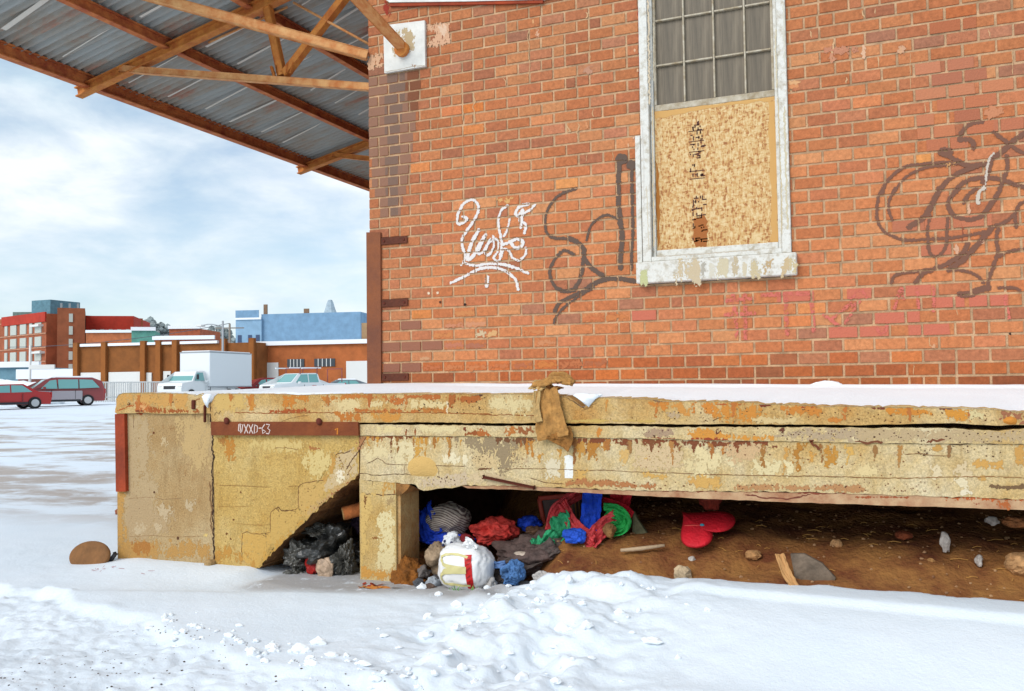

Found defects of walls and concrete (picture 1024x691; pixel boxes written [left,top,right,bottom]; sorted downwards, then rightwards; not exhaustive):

crack [129,403,534,559]
rust [269,394,544,463]
spalling [419,452,535,490]
spalling [632,400,686,474]
rust [557,402,908,499]
spalling [716,411,1024,469]